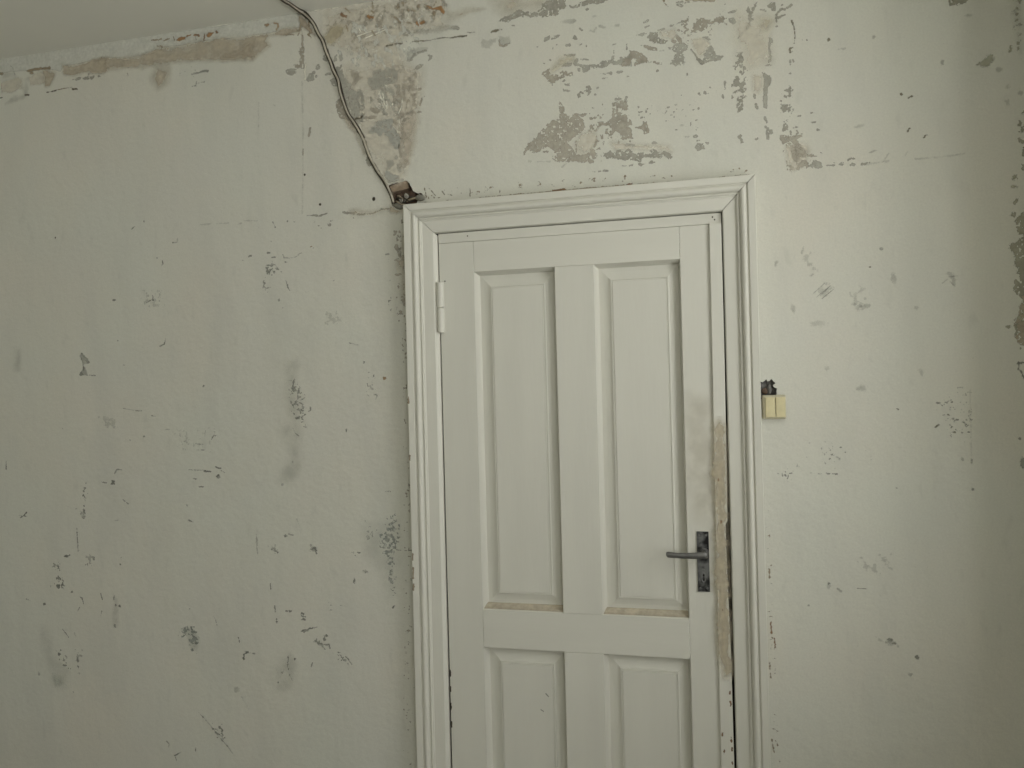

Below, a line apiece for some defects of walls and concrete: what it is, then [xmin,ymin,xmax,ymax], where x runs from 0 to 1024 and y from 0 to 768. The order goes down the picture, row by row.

peeling [286,21,432,204]
spalling [367,0,447,36]
peeling [499,0,607,26]
peeling [524,2,870,172]
peeling [1006,112,1024,349]